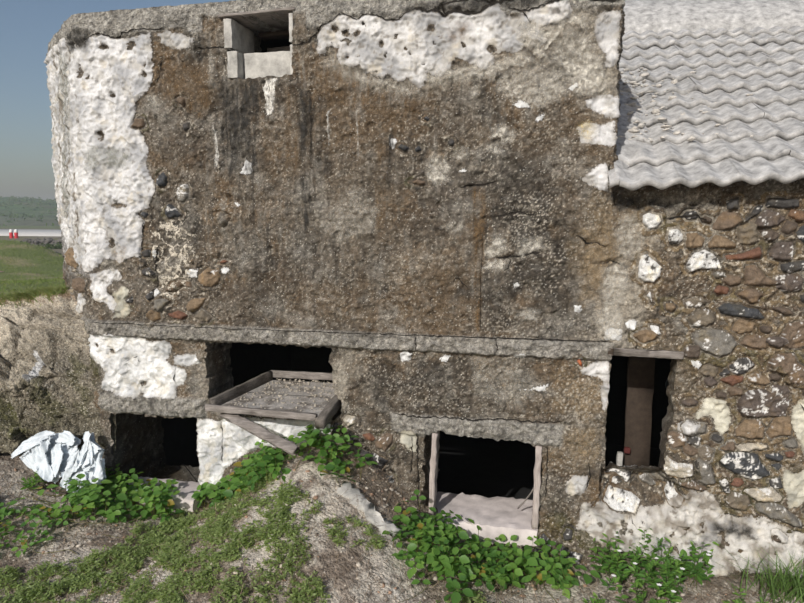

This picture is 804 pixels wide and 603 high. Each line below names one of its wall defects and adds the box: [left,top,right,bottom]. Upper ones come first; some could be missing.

crack [289,0,560,45]
flaking render [316,0,572,88]
flaking render [594,10,622,68]
water stain [213,78,277,174]
flaking render [576,94,620,147]
flaking render [240,160,253,175]
flaking render [580,163,609,192]
flaking render [44,30,233,399]
flaking render [196,418,276,485]
spalling [244,411,418,486]